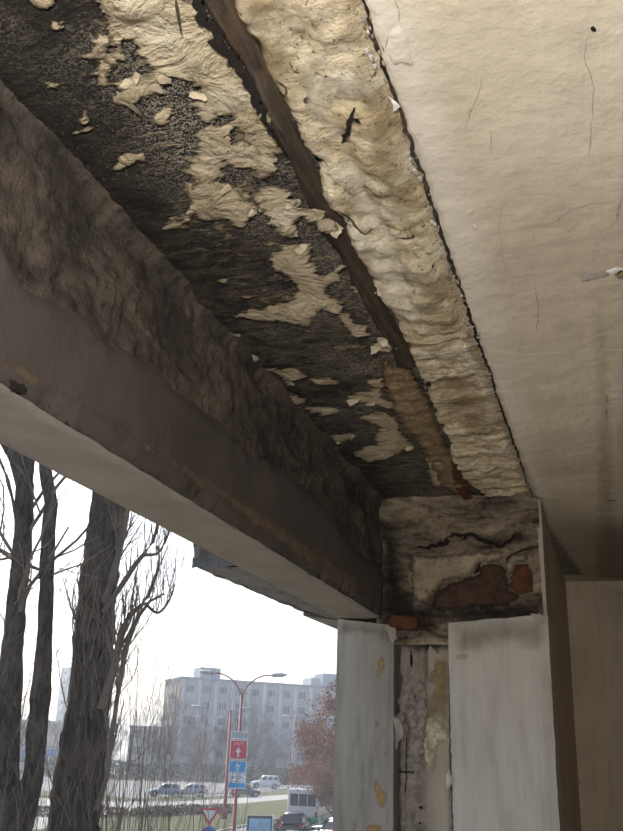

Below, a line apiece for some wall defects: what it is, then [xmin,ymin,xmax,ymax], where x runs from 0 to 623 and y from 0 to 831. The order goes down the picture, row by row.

flaking render [29,0,55,9]
crack [584,31,595,156]
flaking render [72,110,94,134]
flaking render [80,0,473,500]
crack [361,0,531,492]
spalling [8,380,27,394]
flaking render [410,551,533,604]
crack [417,532,531,571]
crack [399,734,411,795]